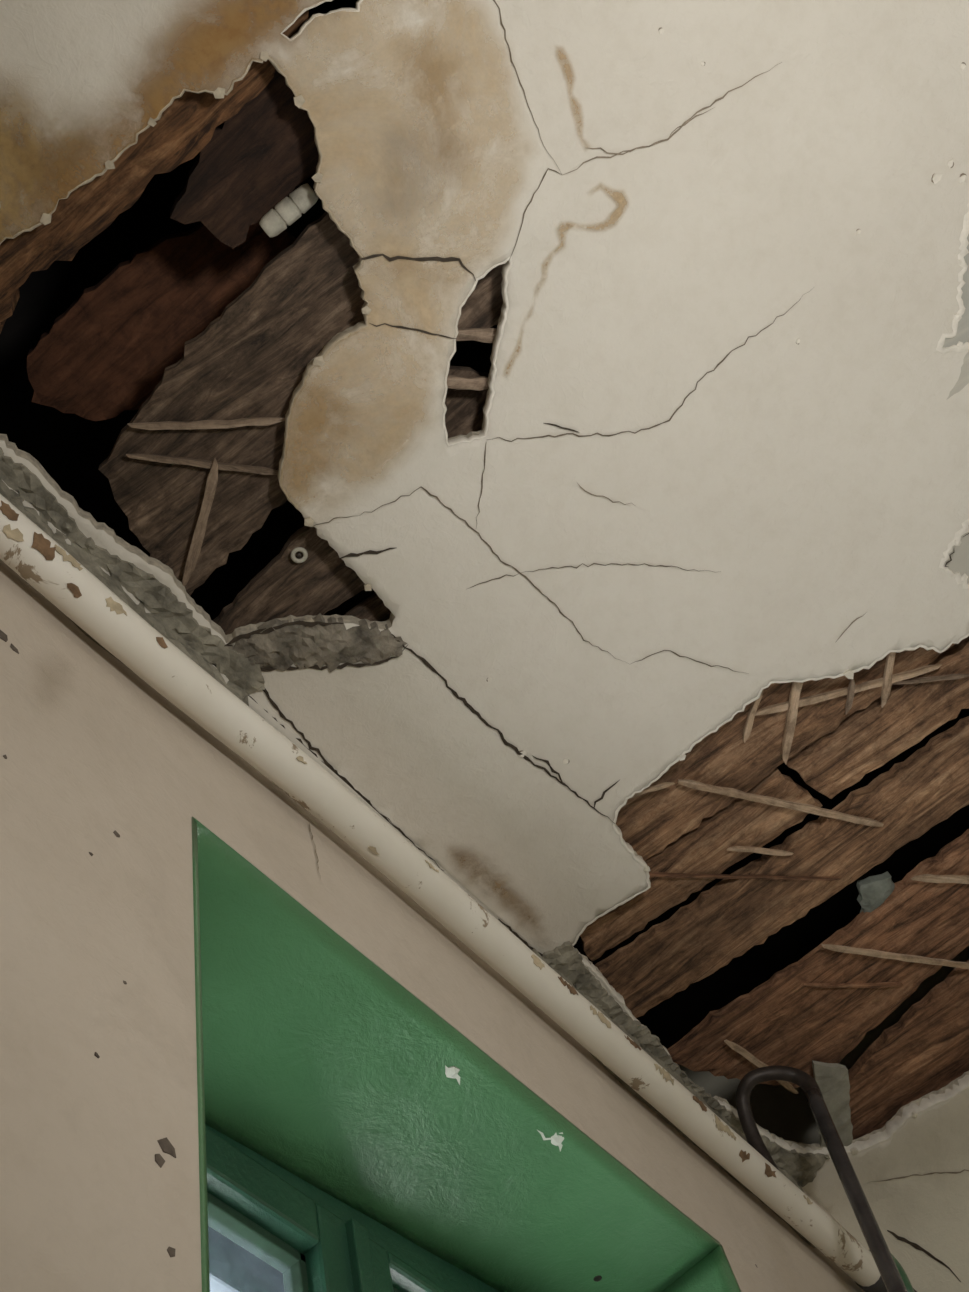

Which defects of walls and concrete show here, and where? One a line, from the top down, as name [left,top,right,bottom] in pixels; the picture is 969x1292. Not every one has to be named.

spalling [0,447,265,706]
leakage [0,0,301,243]
spalling [0,51,372,527]
spalling [279,0,365,43]
leakage [279,1,515,499]
crack [356,254,476,281]
spalling [442,256,513,447]
crack [310,288,813,673]
crack [493,0,782,262]
crack [212,645,444,871]
crack [392,634,618,824]
spalling [531,634,969,1204]